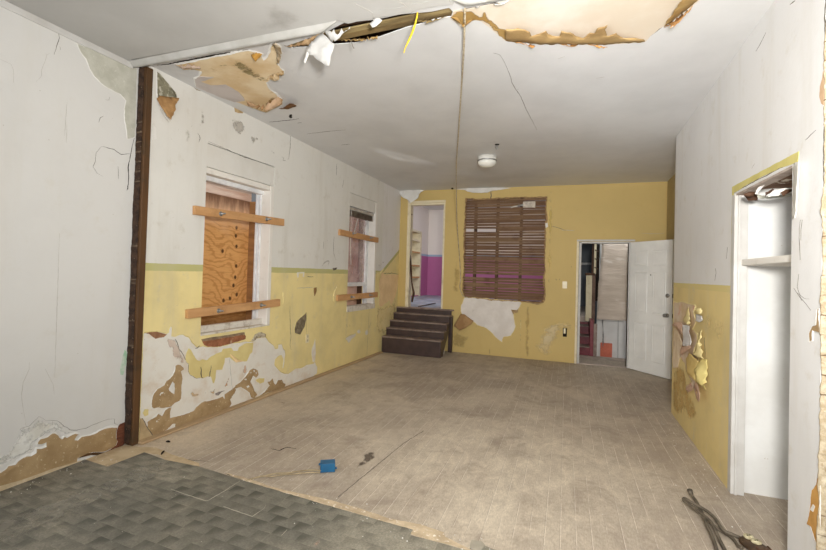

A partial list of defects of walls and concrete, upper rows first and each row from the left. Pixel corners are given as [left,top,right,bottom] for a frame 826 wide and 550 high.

peeling [450,0,699,45]
flaking render [77,43,137,139]
spalling [156,71,177,98]
peeling [174,42,297,113]
crack [93,140,134,189]
peeling [461,196,548,342]
spalling [806,0,826,550]
peeling [139,326,317,440]
spalling [294,313,307,335]
peeling [672,301,708,402]
flaking render [0,419,125,486]